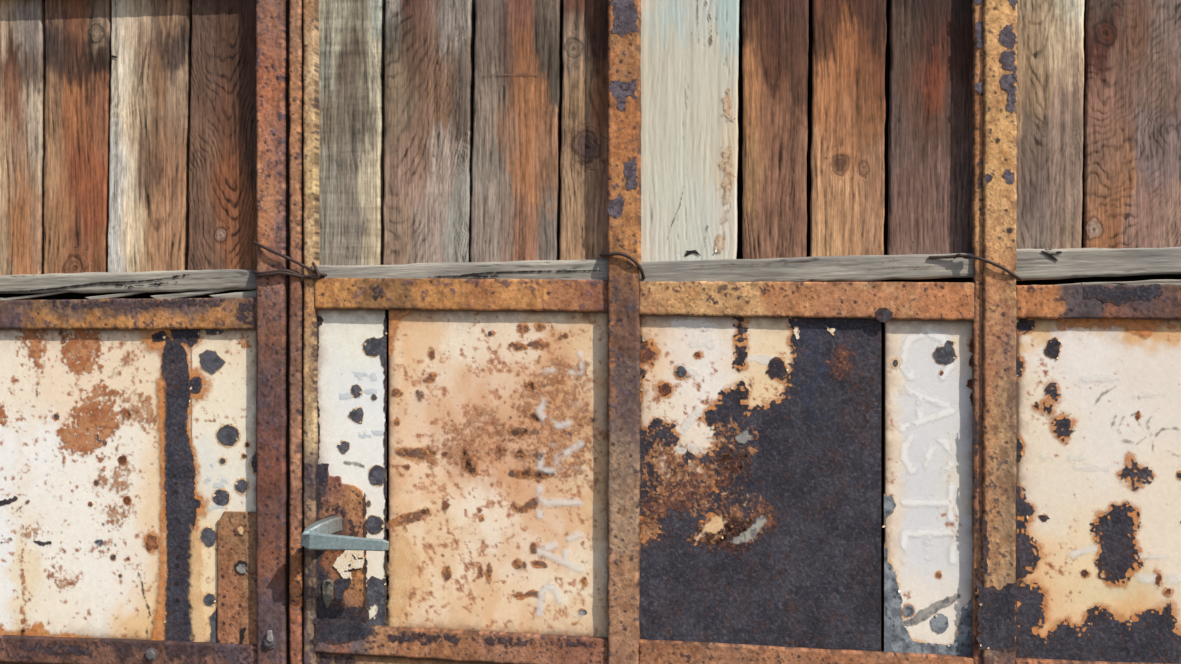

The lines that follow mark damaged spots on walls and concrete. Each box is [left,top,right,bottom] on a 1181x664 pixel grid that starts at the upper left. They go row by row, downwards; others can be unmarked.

peeling [640,338,661,369]
peeling [656,351,703,398]
peeling [766,357,788,383]
corrosion [391,322,599,489]
corrosion [15,329,209,642]
corrosion [511,497,540,513]
peeling [703,516,724,533]
peeling [731,515,767,544]
corrosion [0,525,93,638]
corrosion [386,499,450,627]
corrosion [513,542,547,569]
peeling [884,546,989,656]